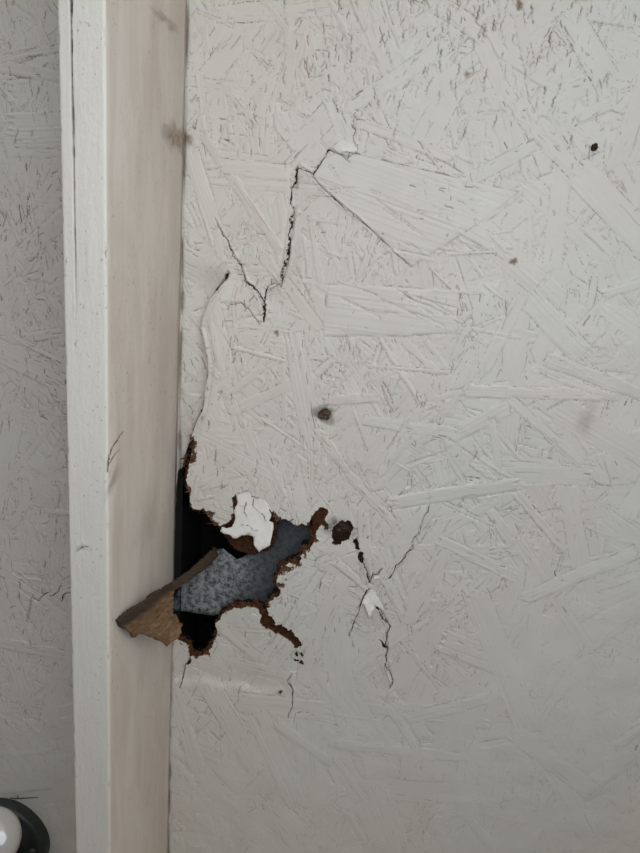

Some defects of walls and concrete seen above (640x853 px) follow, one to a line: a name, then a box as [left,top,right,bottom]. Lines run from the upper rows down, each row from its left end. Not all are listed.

crack [215,127,410,324]
peeling [183,429,286,552]
spalling [177,514,315,657]
crack [349,507,429,688]